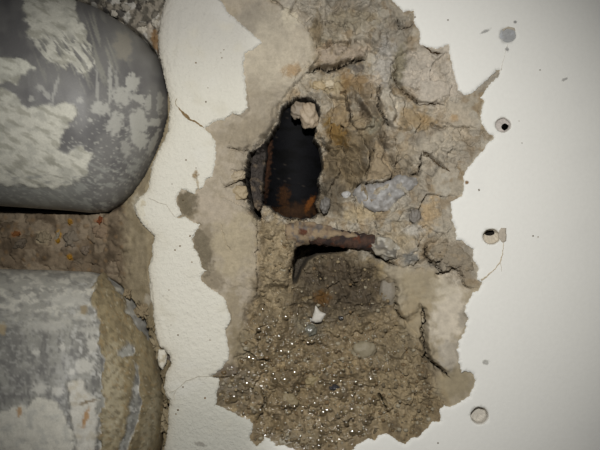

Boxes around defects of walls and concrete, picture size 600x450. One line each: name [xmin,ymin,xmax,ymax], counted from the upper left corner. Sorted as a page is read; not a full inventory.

crack [175,99,204,128]
crack [306,59,365,73]
crack [377,66,443,126]
rust [272,187,317,218]
spalling [176,0,500,450]
crack [421,304,448,376]